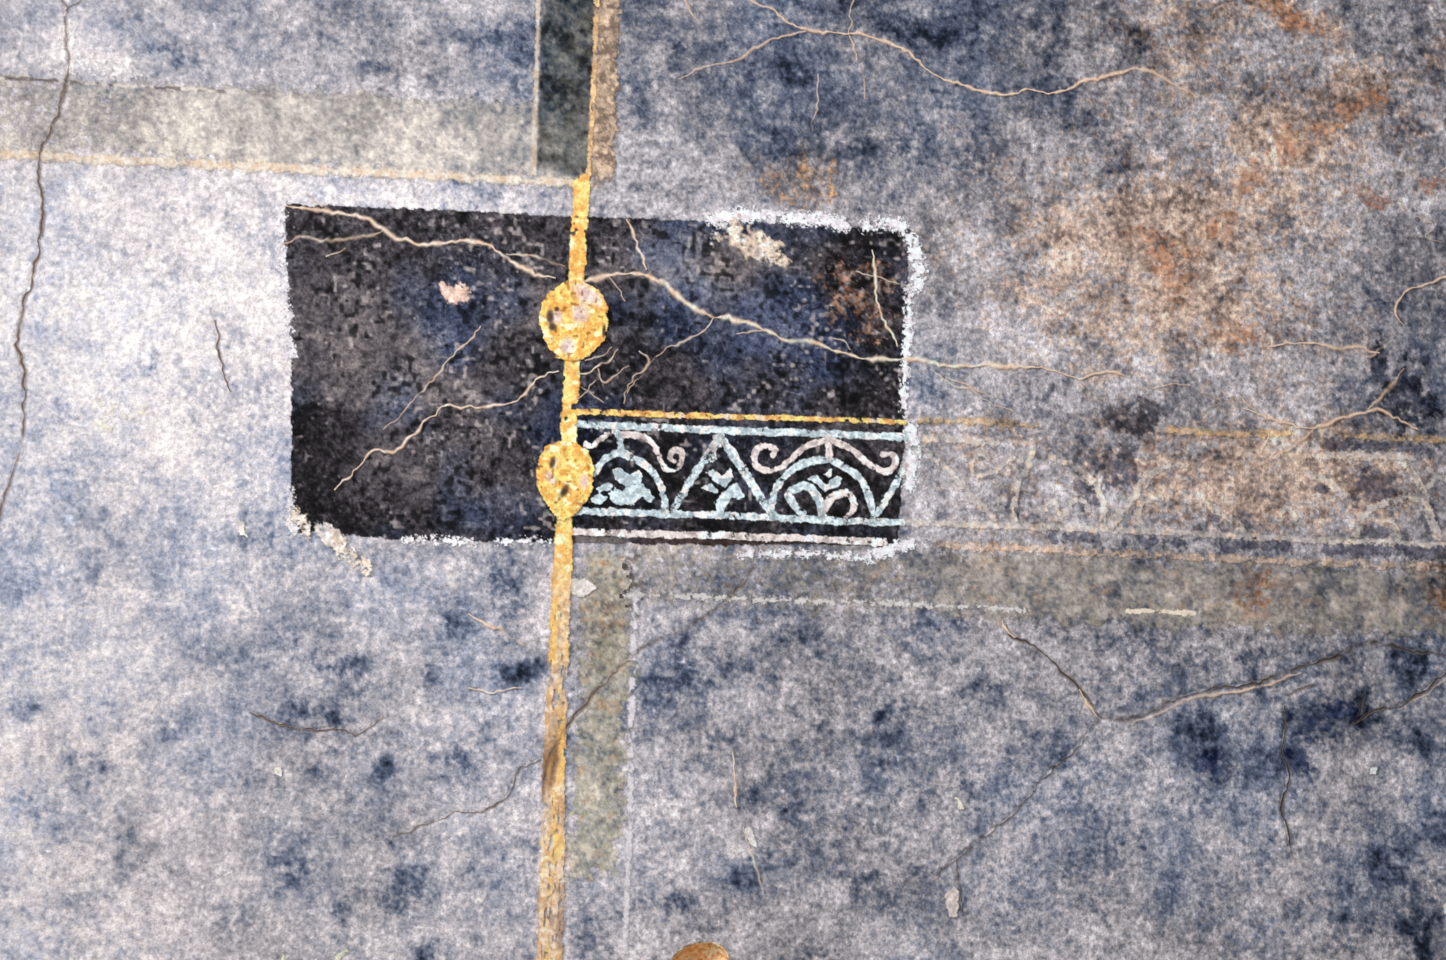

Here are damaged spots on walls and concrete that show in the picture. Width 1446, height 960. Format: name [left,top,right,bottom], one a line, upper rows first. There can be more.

crack [700,0,1192,96]
crack [0,0,81,516]
crack [283,194,1183,490]
crack [1237,341,1418,452]
crack [1394,216,1446,324]
crack [1002,621,1446,845]
crack [948,746,1079,907]